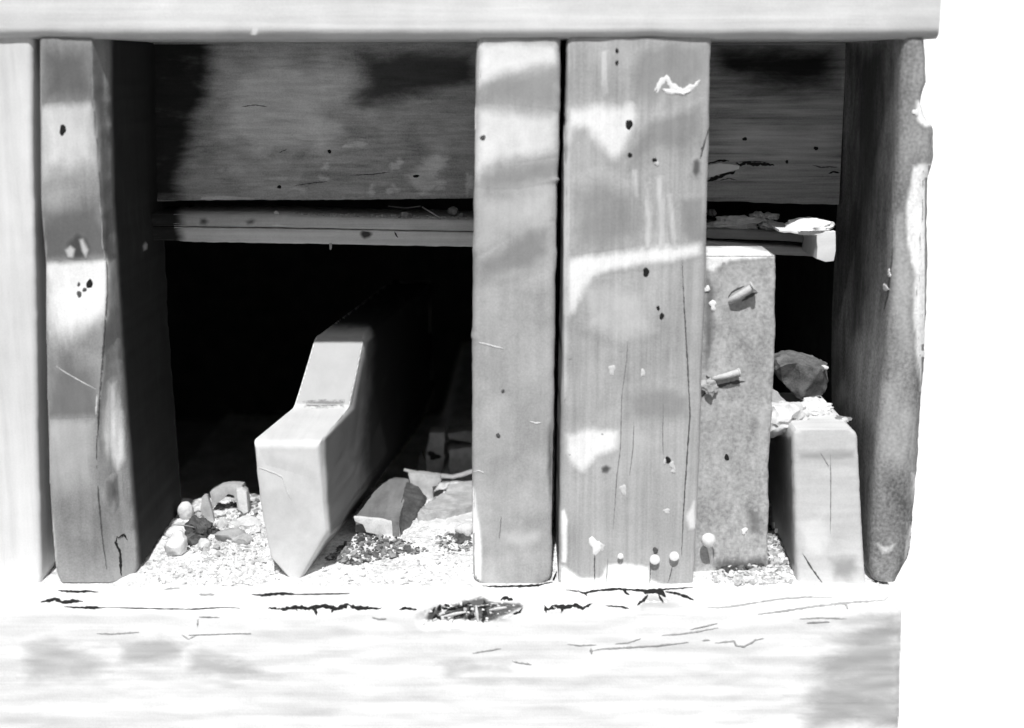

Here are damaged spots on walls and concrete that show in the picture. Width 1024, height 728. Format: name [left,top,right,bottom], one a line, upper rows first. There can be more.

crack [700,128,774,182]
crack [41,296,417,640]
crack [544,265,888,654]